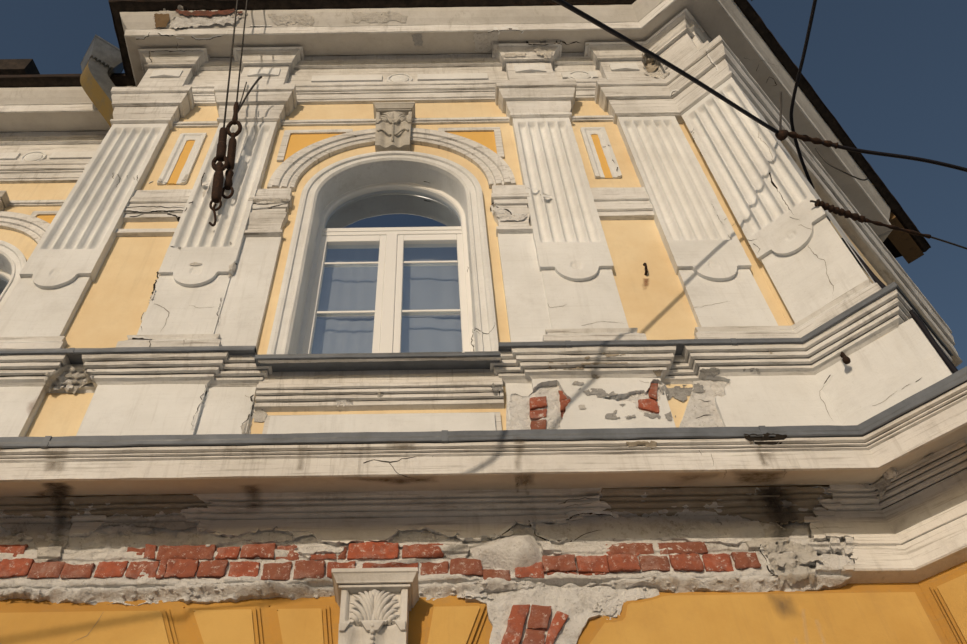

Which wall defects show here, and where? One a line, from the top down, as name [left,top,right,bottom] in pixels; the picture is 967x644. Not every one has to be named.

flaking render [153,5,247,29]
crack [757,124,834,291]
crack [132,304,169,347]
crack [196,297,224,325]
flaking render [491,352,729,430]
crack [819,375,833,419]
crack [364,456,433,478]
water stain [39,483,69,507]
water stain [741,473,792,531]
flaking render [0,467,900,644]